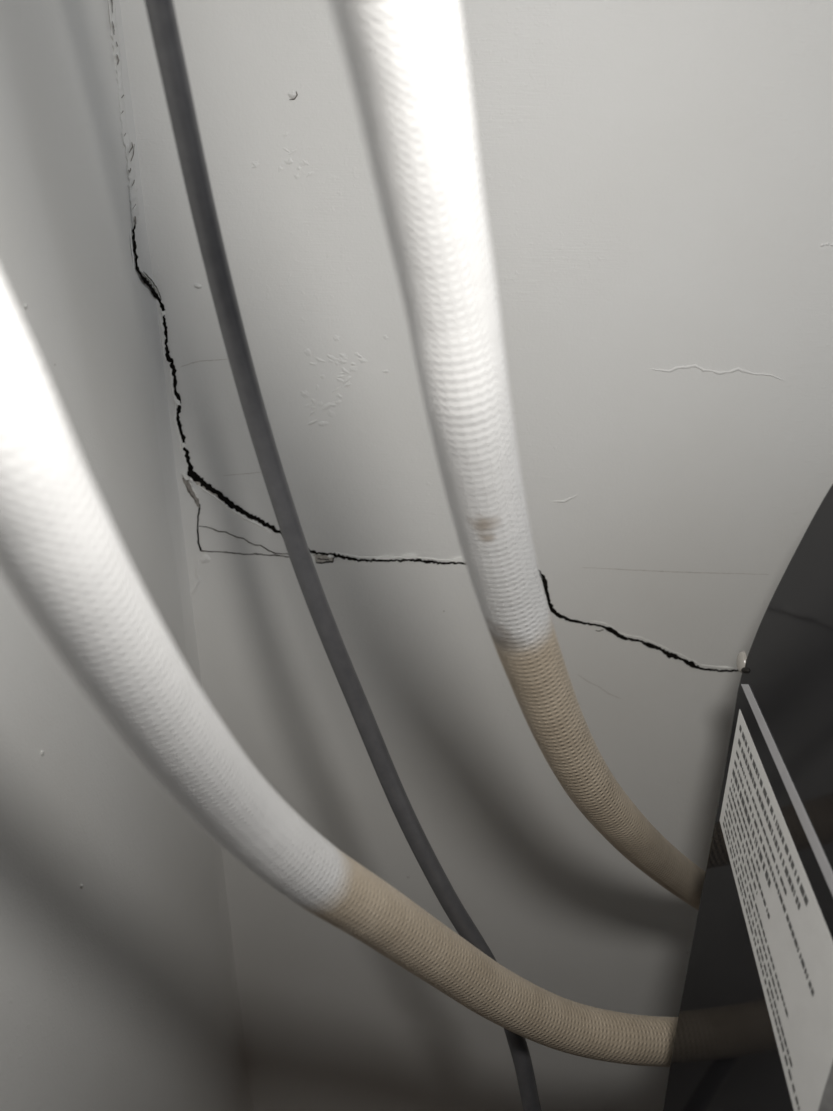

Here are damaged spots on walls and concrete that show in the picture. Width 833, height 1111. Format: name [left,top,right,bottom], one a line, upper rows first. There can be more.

crack [130,224,465,565]
crack [539,570,738,672]